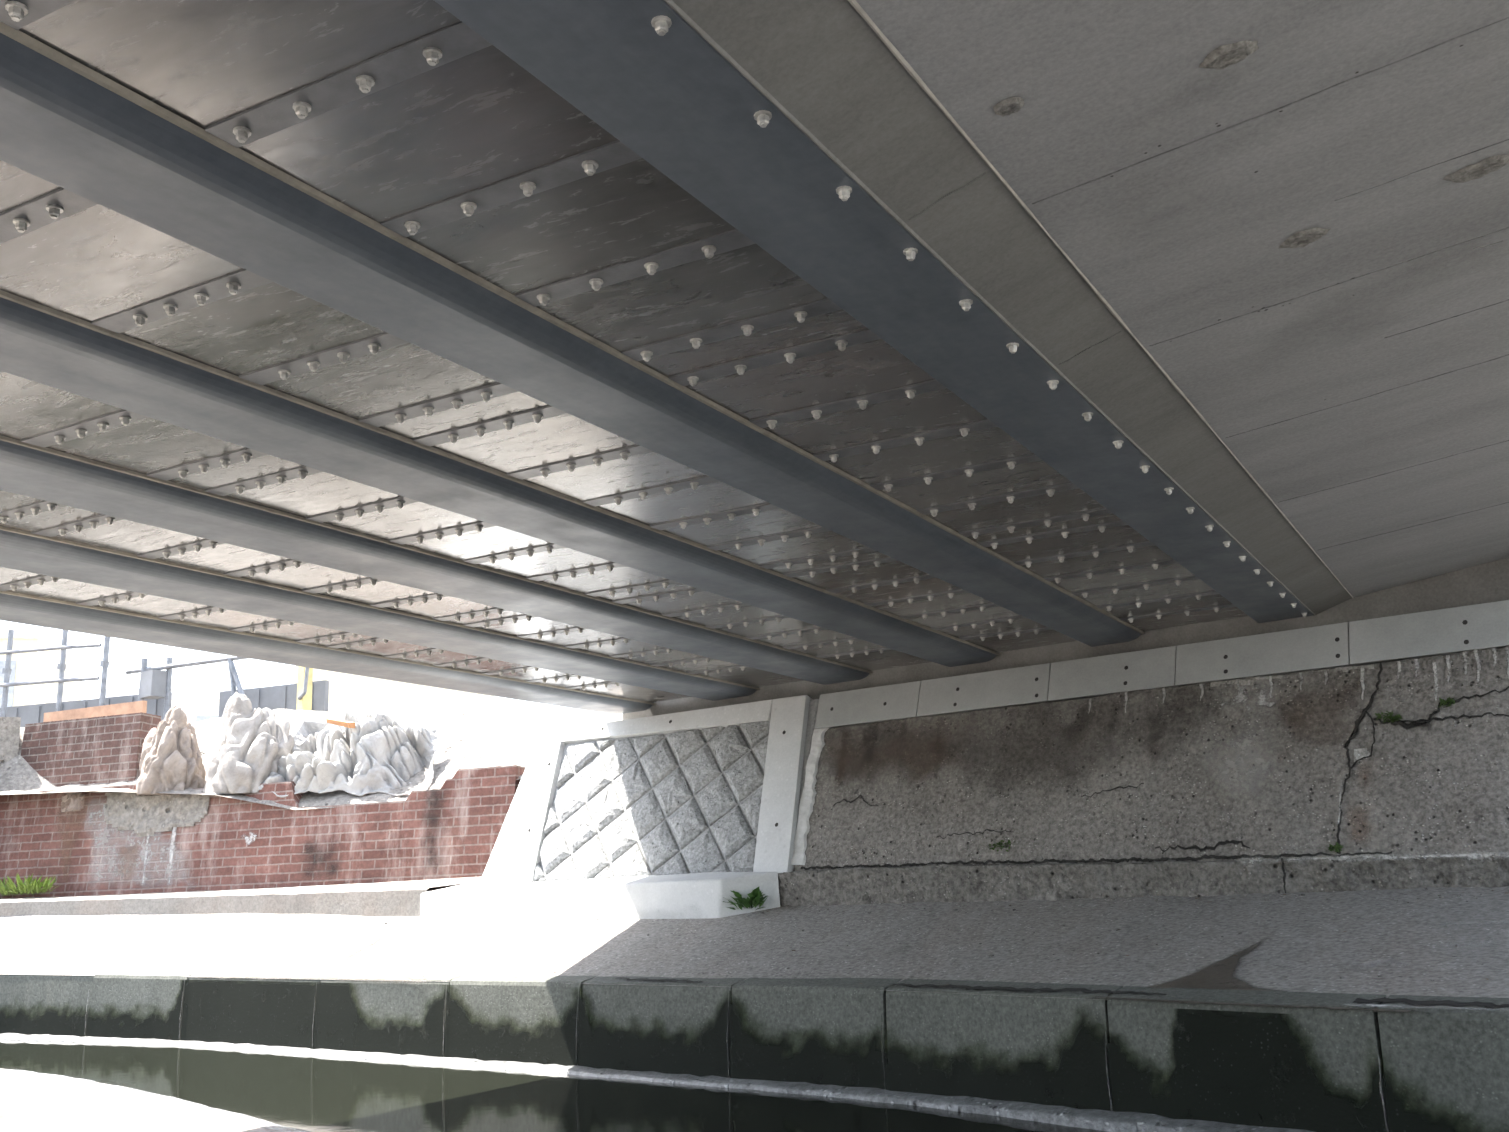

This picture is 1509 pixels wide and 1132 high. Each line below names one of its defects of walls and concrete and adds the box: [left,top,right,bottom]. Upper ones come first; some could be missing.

spalling [1199,40,1259,70]
spalling [993,97,1025,117]
spalling [1442,154,1509,183]
spalling [1279,227,1331,249]
crack [801,663,1509,893]